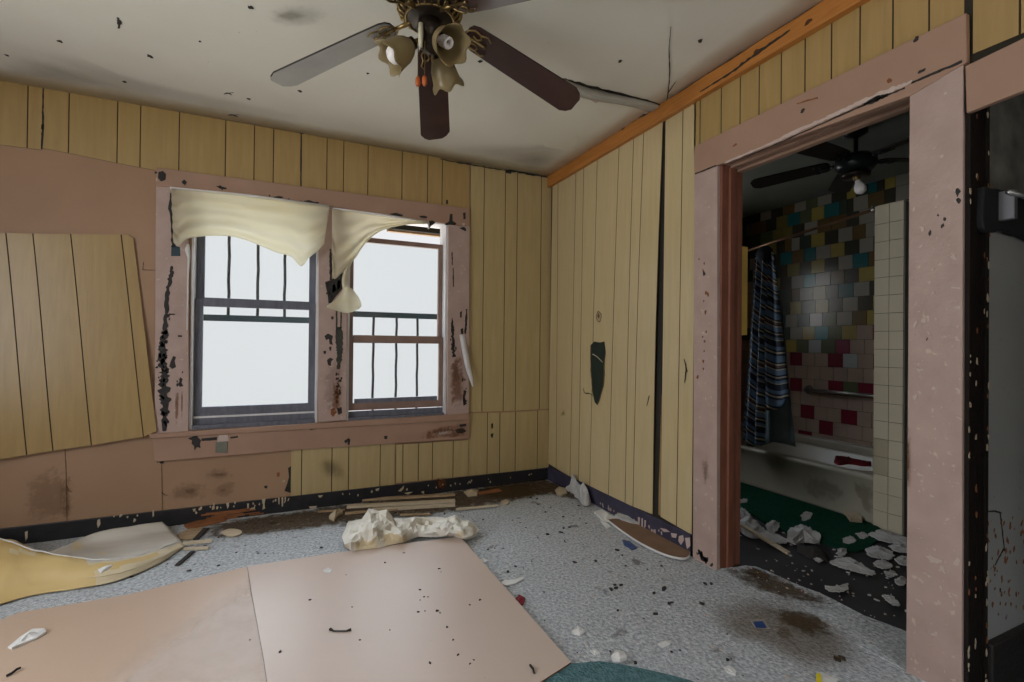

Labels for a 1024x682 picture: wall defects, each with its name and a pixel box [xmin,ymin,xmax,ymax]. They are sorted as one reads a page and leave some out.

crack [633,28,675,122]
crack [700,30,790,92]
peeling [155,193,183,431]
peeling [323,249,347,418]
hole [583,342,606,405]
peeling [193,466,291,514]